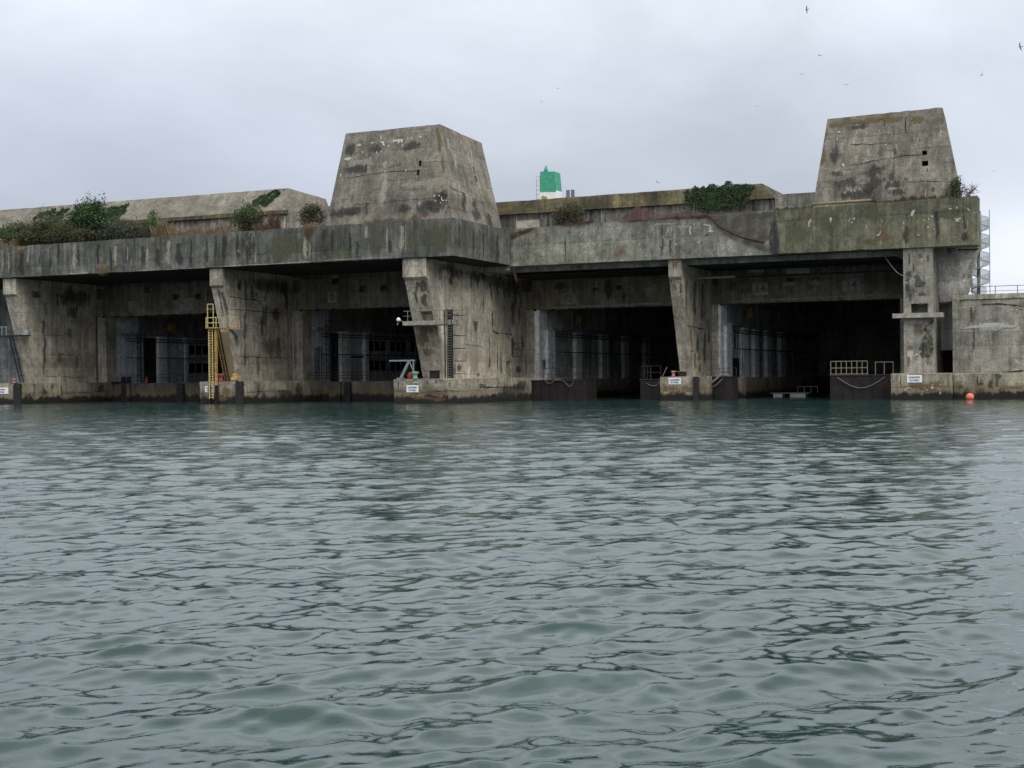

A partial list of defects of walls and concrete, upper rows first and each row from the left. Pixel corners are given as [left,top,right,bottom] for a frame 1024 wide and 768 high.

water stain [331,145,388,217]
water stain [830,143,906,200]
water stain [35,245,94,374]
water stain [97,233,309,271]
water stain [414,280,427,306]
water stain [428,264,526,399]
water stain [903,226,932,303]